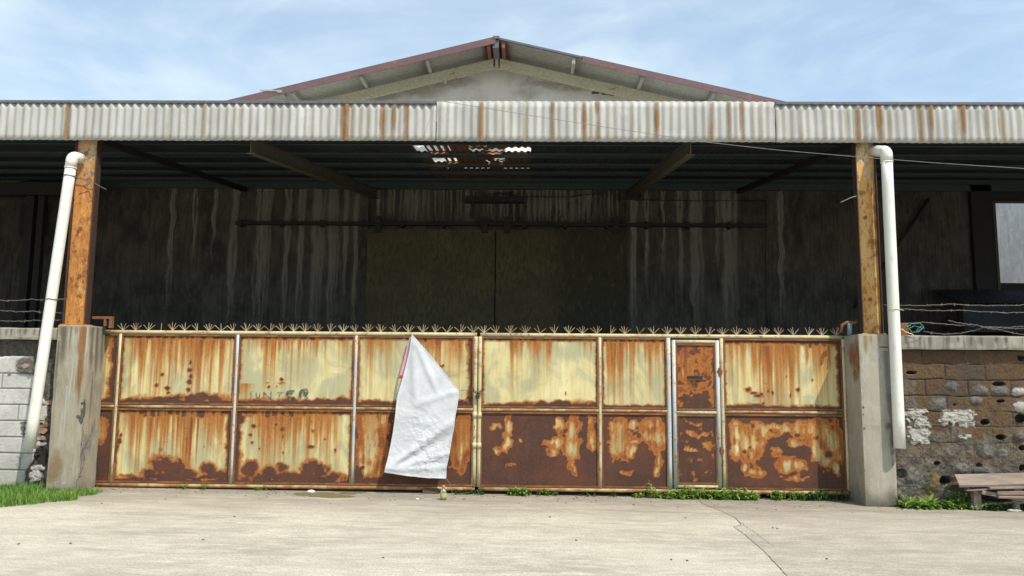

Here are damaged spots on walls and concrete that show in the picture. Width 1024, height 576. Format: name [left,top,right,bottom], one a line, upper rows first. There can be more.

corrosion [340,104,349,140]
corrosion [380,104,408,141]
corrosion [583,101,599,141]
corrosion [876,105,892,142]
leakage [377,189,592,219]
leakage [227,189,240,306]
leakage [251,189,360,314]
leakage [608,190,704,309]
leakage [715,191,737,317]
corrosion [96,336,859,489]
crack [76,418,96,486]
crack [697,498,787,576]